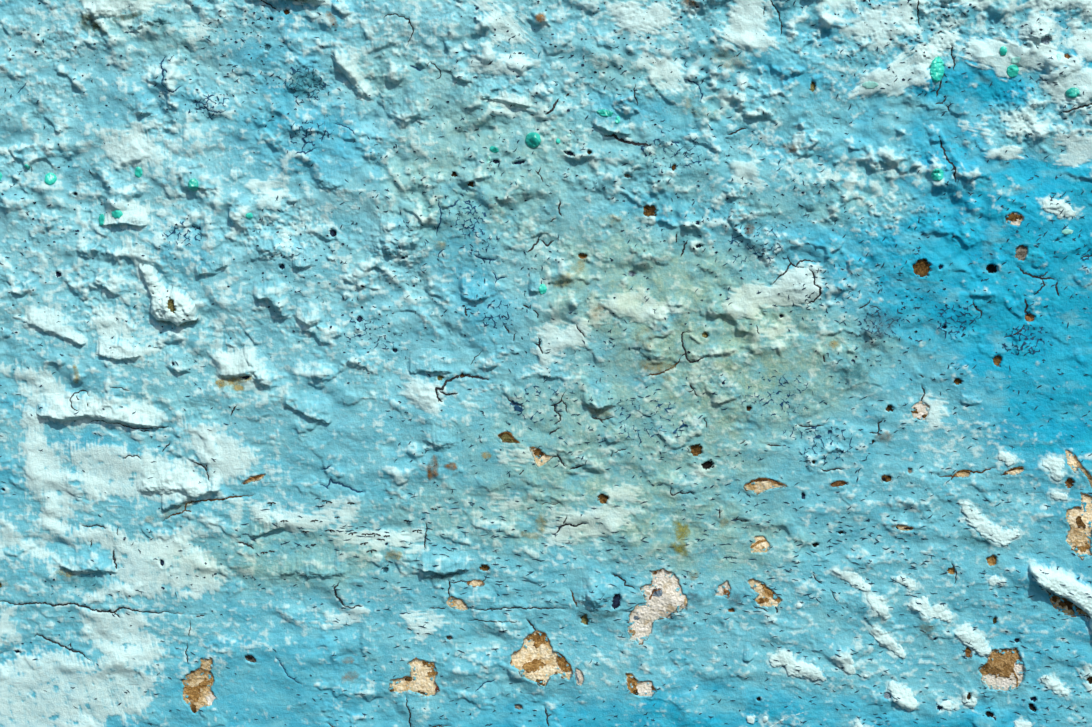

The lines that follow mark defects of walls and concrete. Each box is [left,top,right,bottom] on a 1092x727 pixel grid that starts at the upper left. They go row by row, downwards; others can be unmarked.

crack [977,27,1092,163]
crack [0,252,89,416]
spalling [743,478,787,495]
spalling [1064,450,1092,560]
crack [82,514,118,569]
crack [3,563,222,680]
spalling [627,569,688,645]
spalling [182,657,216,713]
spalling [389,657,440,696]
spalling [510,630,584,687]
spalling [979,648,1026,693]